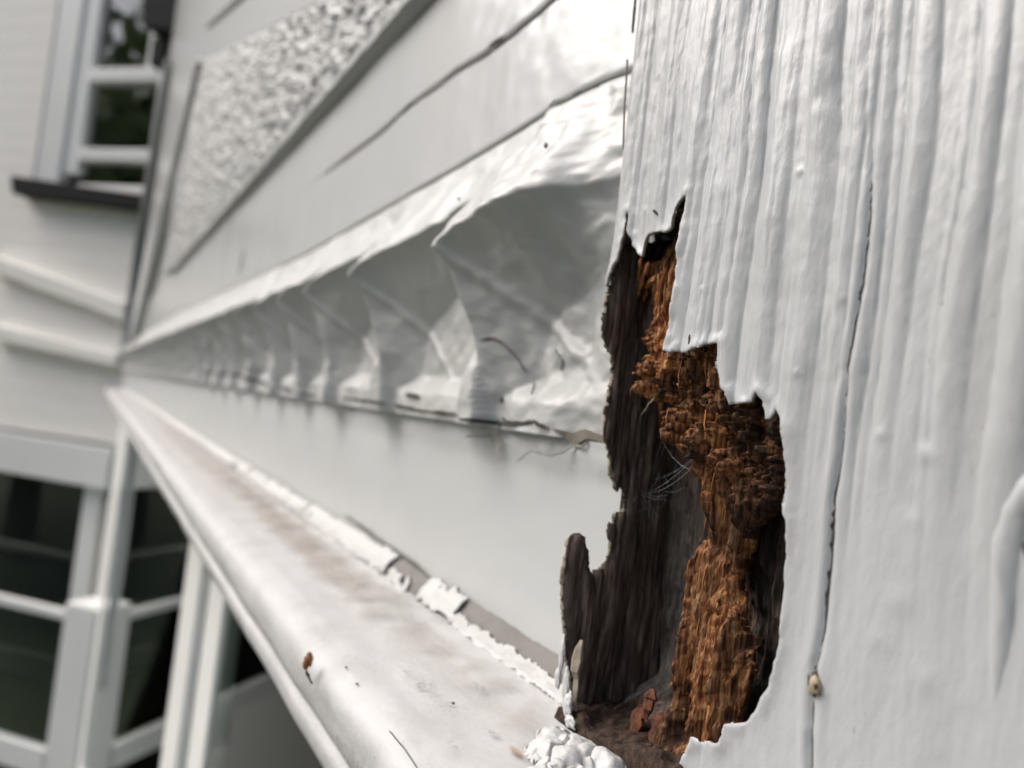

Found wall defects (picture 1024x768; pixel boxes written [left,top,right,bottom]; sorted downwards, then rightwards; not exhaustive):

crack [808,150,873,768]